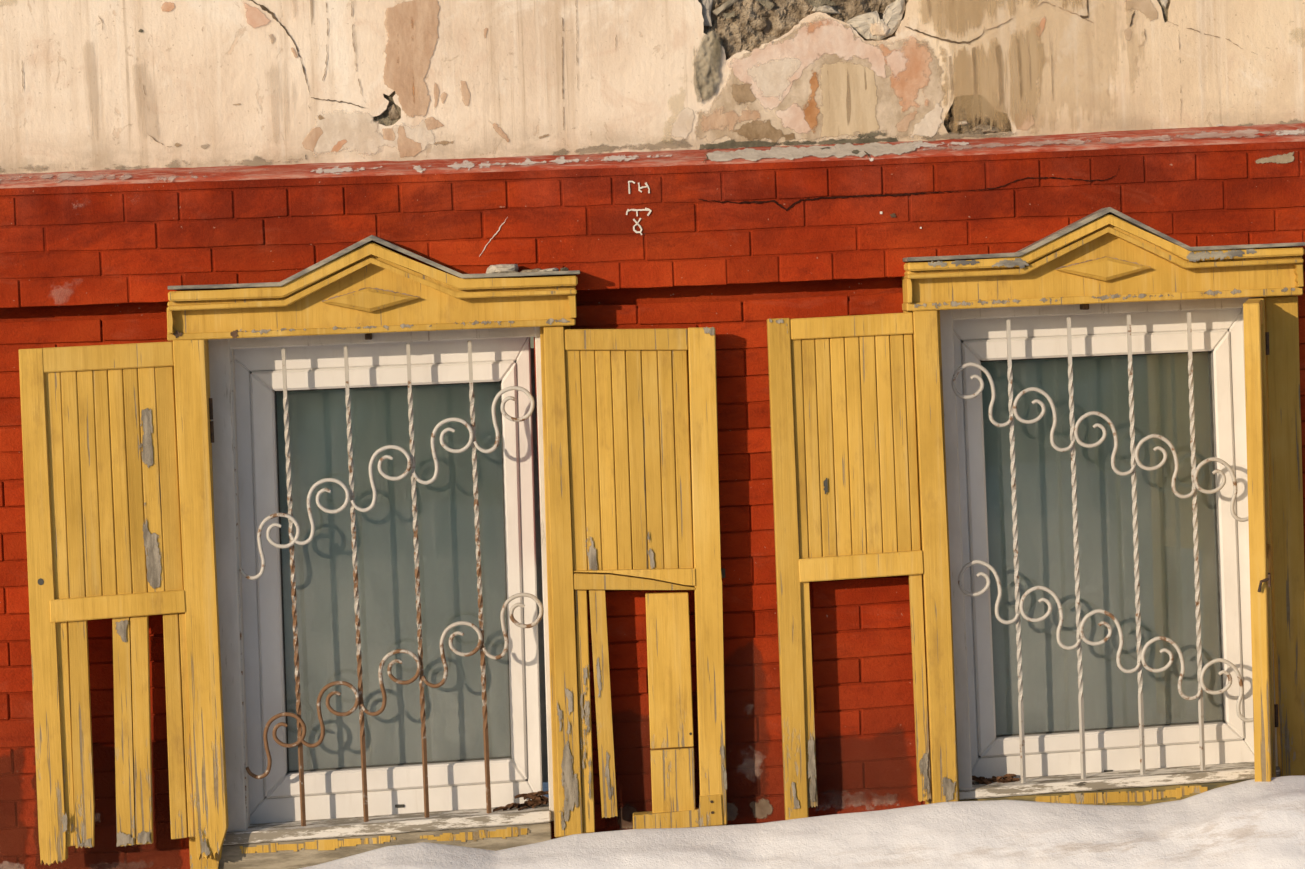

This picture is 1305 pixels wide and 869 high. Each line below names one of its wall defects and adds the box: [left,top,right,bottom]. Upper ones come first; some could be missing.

crack [251,0,366,108]
peeling [302,0,470,174]
peeling [672,0,1305,162]
peeling [493,123,509,142]
peeling [447,155,672,170]
peeling [1256,152,1294,164]
peeling [143,503,162,589]
peeling [115,620,128,642]
peeling [1035,785,1207,805]
peeling [61,813,92,847]
peeling [116,829,152,847]
peeling [199,824,210,856]